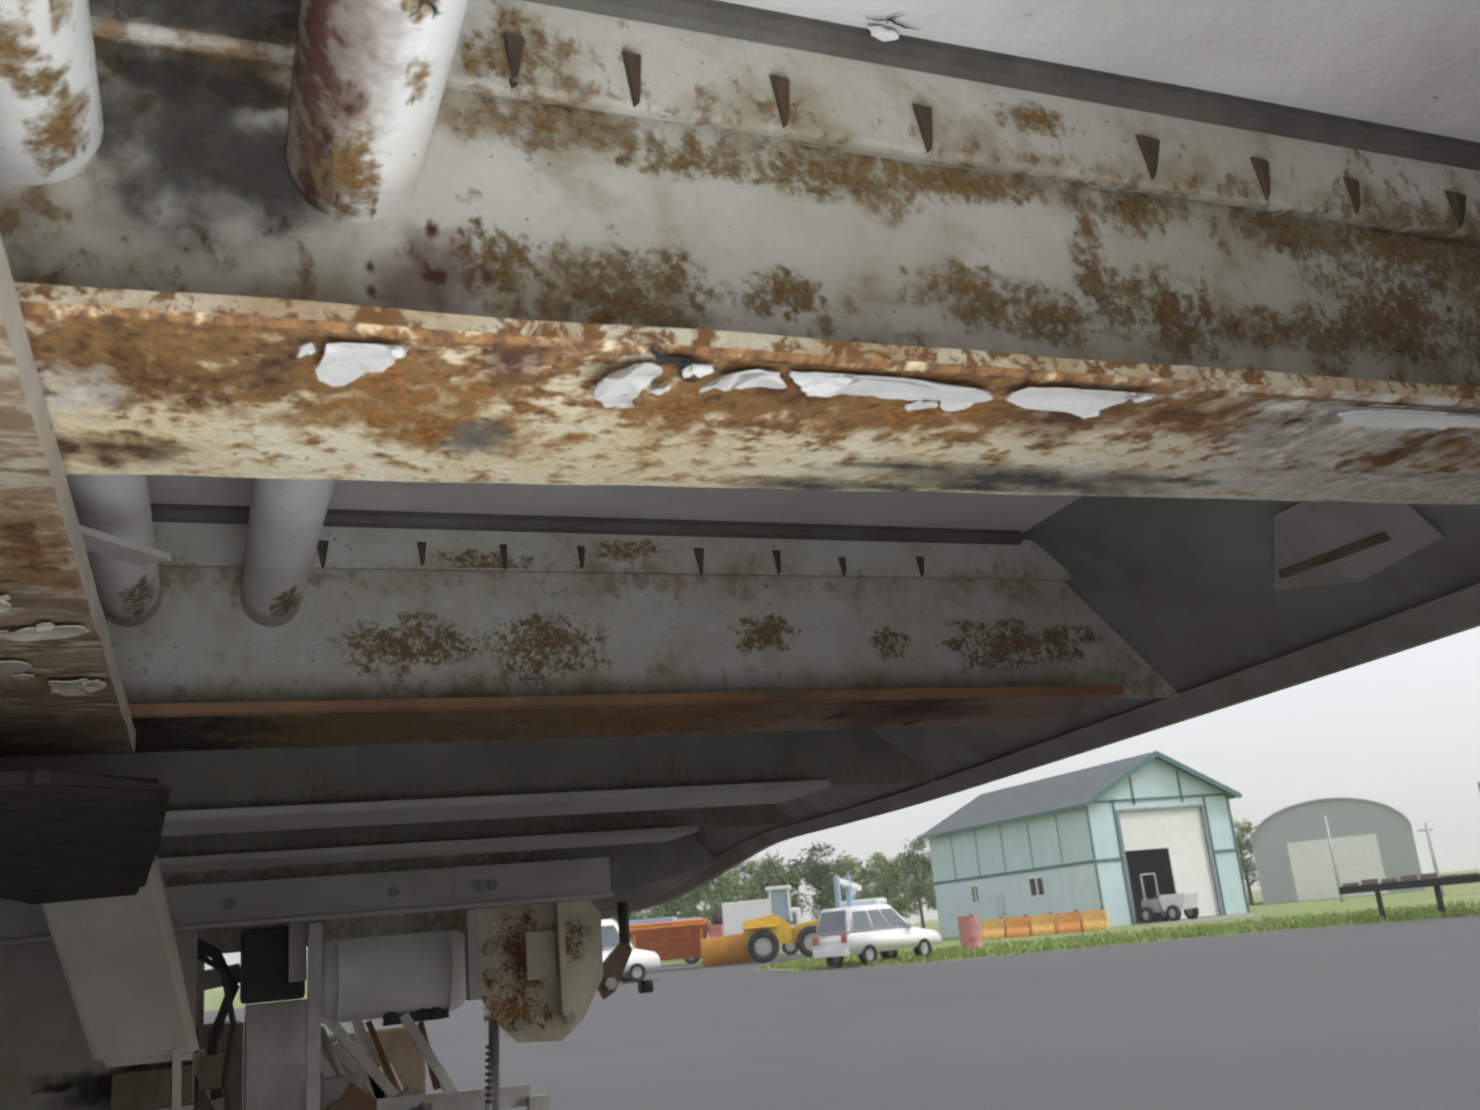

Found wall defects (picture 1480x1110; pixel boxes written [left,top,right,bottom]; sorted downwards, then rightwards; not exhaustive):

corrosion [0,8,89,172]
corrosion [290,0,381,219]
corrosion [452,0,1033,223]
corrosion [401,217,717,325]
corrosion [900,189,1480,374]
corrosion [29,319,548,456]
corrosion [623,363,1011,446]
peeling [592,363,1156,419]
peeling [0,595,11,612]
peeling [0,622,90,641]
peeling [0,661,106,696]
corrosion [340,612,610,684]